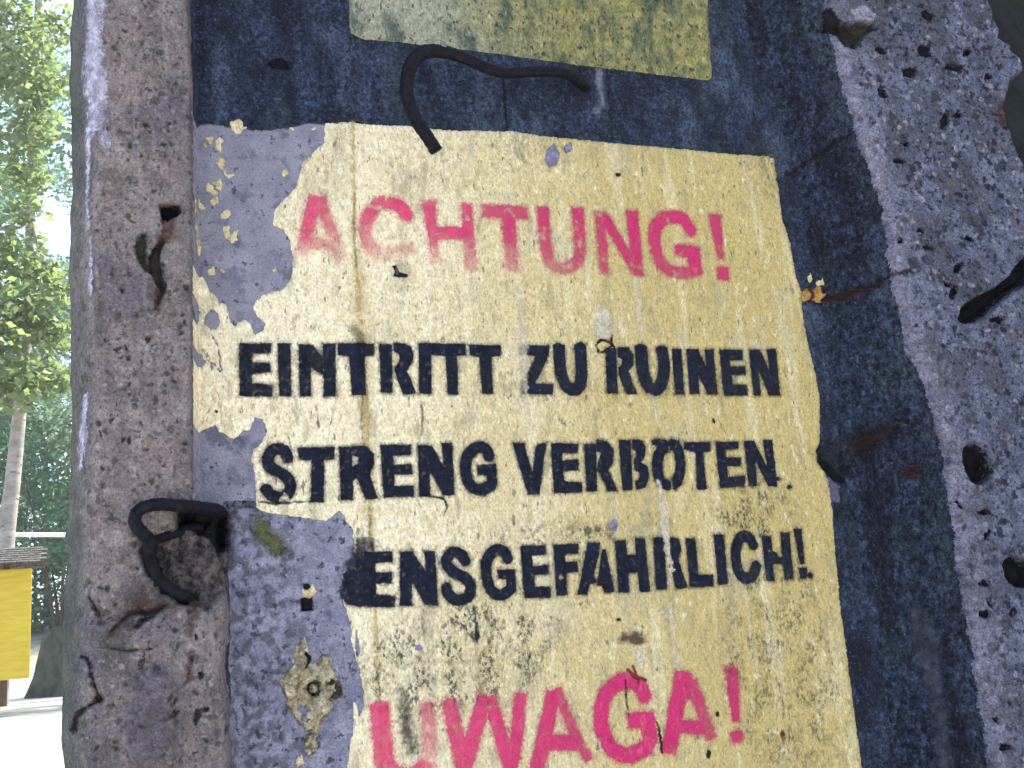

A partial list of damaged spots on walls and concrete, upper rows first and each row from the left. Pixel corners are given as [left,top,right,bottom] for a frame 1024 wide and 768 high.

spalling [821,7,875,49]
corrosion [161,219,174,245]
peeling [190,111,325,373]
corrosion [800,273,826,303]
peeling [140,410,364,768]